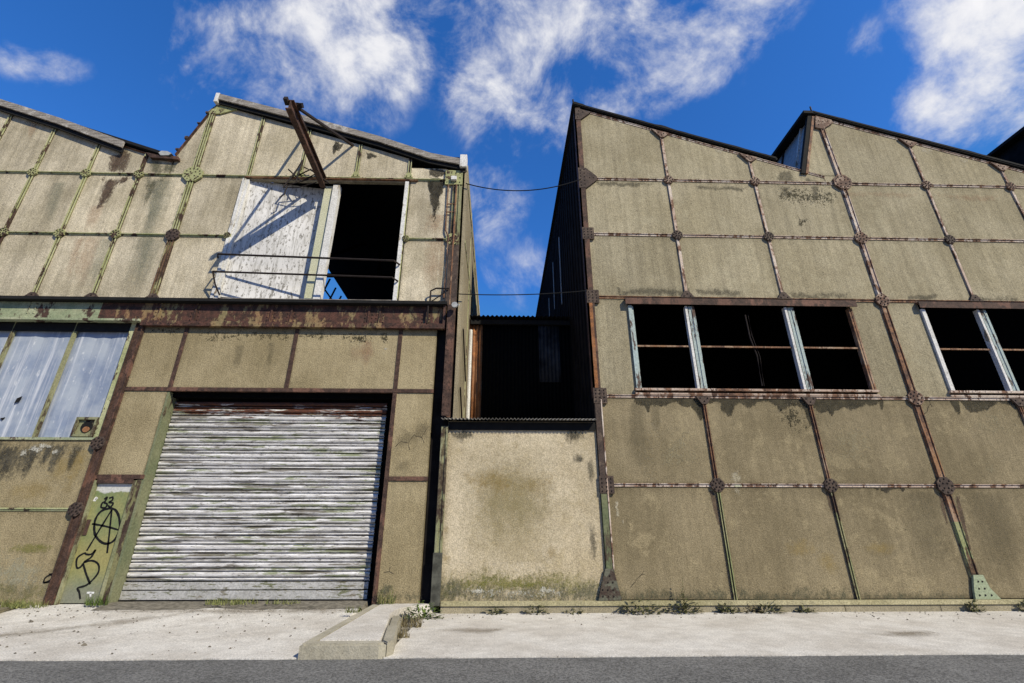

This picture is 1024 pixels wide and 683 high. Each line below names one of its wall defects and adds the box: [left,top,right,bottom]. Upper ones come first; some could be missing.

damp [97,150,132,208]
damp [428,169,446,218]
damp [778,172,837,207]
rust [589,303,599,388]
damp [0,442,80,479]